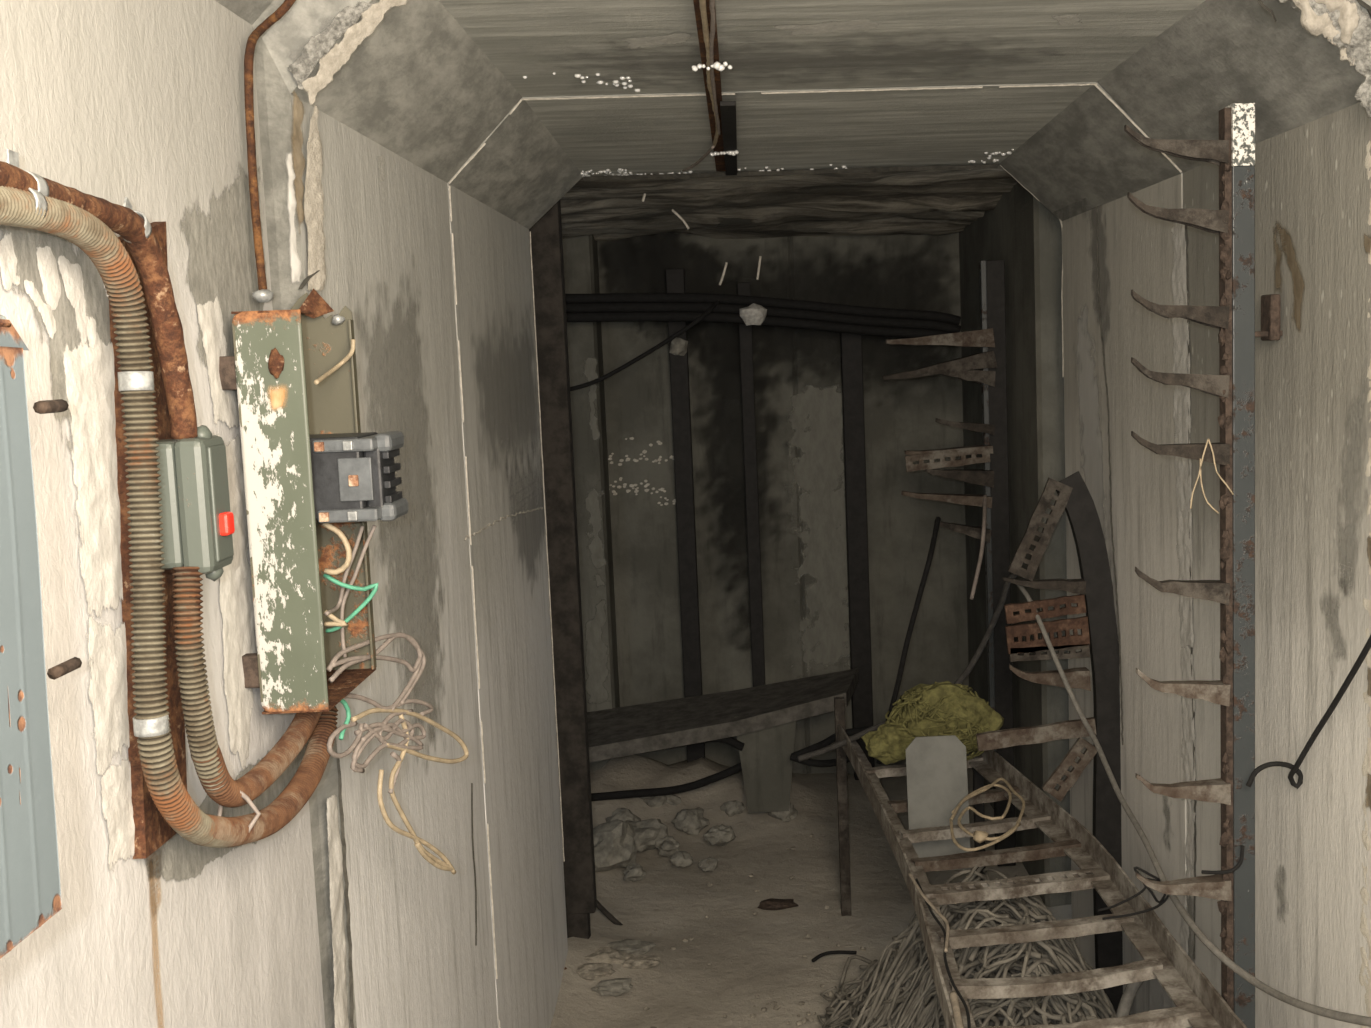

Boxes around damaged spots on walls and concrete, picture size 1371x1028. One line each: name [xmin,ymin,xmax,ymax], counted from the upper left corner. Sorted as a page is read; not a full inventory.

spalling [1258,0,1371,117]
spalling [287,0,407,291]
water stain [601,231,738,295]
peeling [180,165,269,780]
peeling [0,225,257,881]
peeling [1322,585,1345,656]
peeling [199,741,308,817]
peeling [1359,598,1371,1028]
peeling [1277,869,1285,913]